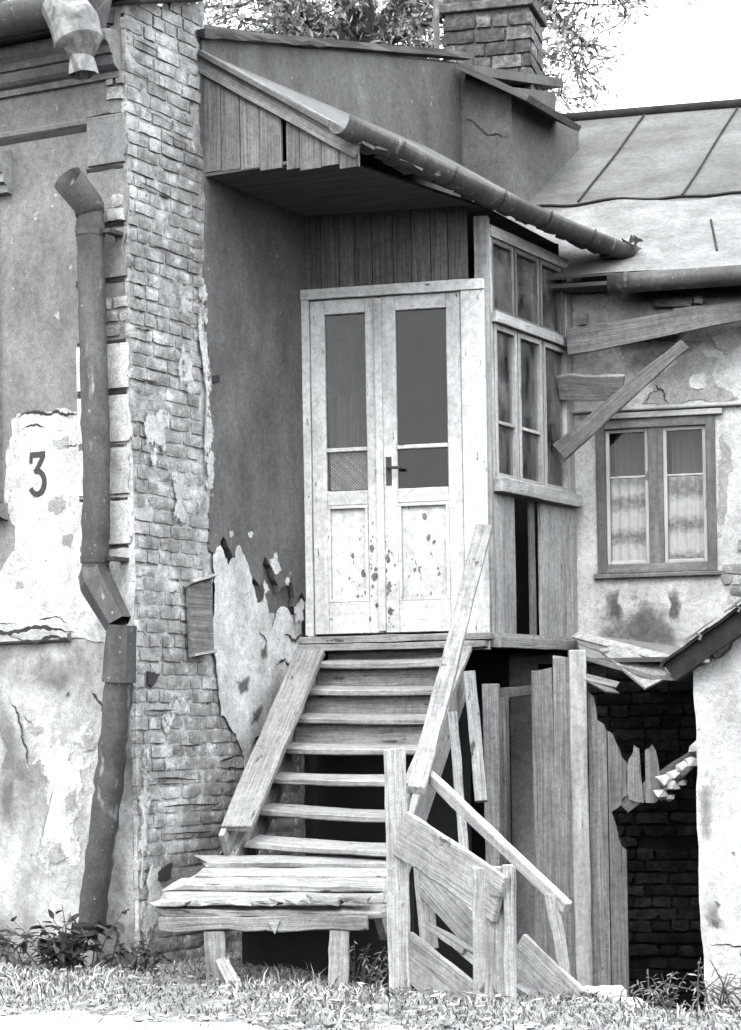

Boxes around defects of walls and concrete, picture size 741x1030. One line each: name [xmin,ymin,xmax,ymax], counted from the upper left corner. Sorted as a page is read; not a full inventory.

crack [9,698,33,773]
peeling [0,408,106,643]
peeling [109,439,136,626]
spalling [213,530,305,768]
water stain [607,593,680,646]
flaking render [721,564,741,605]